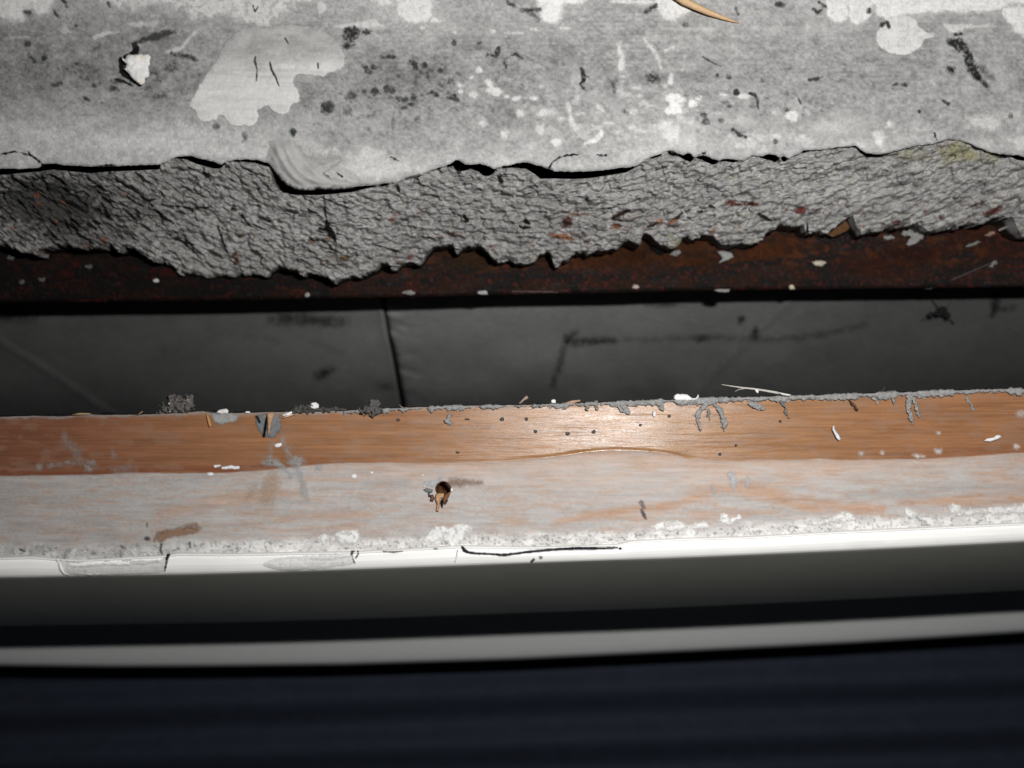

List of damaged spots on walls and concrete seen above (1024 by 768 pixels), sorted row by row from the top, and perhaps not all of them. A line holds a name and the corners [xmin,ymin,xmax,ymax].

crack [760,150,804,161]
crack [853,146,875,157]
crack [988,152,1024,161]
crack [0,150,734,260]
spalling [0,134,1024,286]
rust [548,214,577,241]
rust [827,221,849,237]